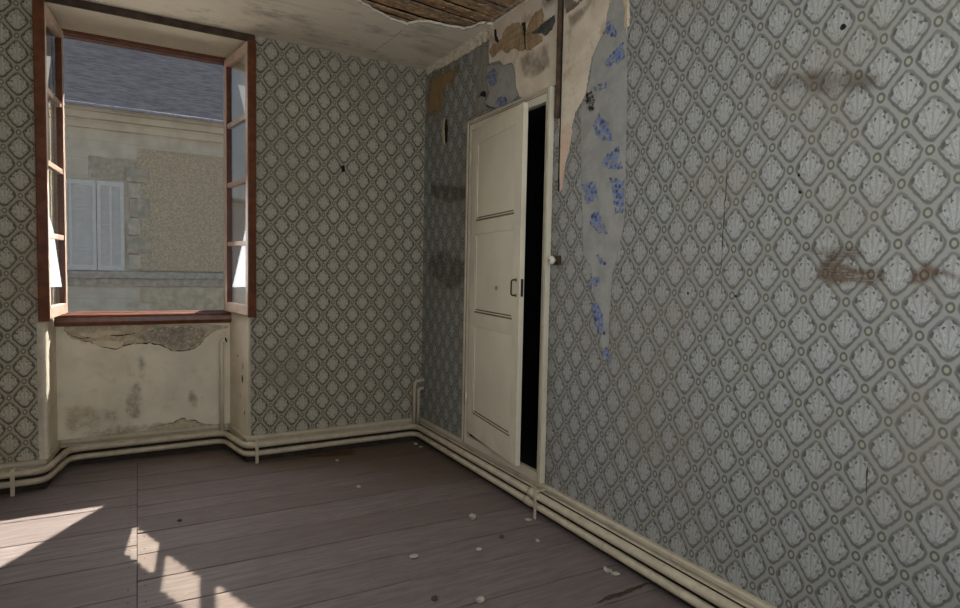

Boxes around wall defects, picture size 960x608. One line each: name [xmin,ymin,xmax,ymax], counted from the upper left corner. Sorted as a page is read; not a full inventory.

flaking render [426,0,610,192]
flaking render [64,324,228,351]